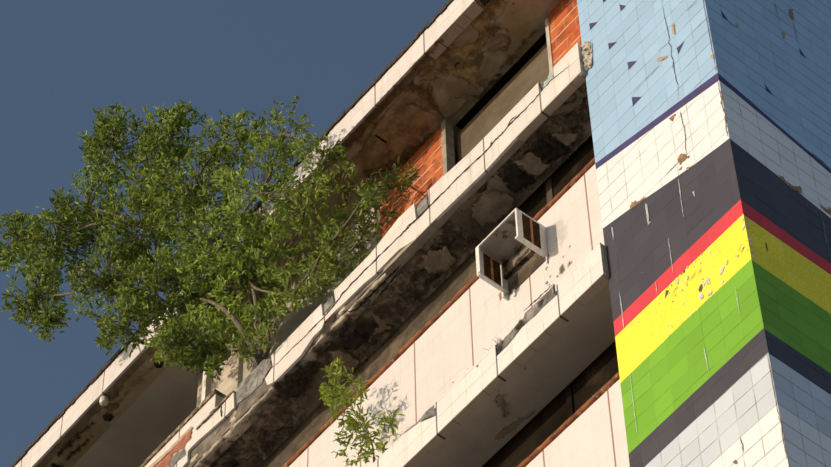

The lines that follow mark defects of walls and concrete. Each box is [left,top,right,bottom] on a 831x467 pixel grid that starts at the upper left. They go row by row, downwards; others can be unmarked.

water stain [412,39,454,76]
spalling [581,41,593,72]
water stain [337,82,442,159]
peeling [659,247,720,306]
peeling [713,217,755,284]
peeling [497,284,556,354]
water stain [269,315,354,404]
flaking render [149,426,193,467]